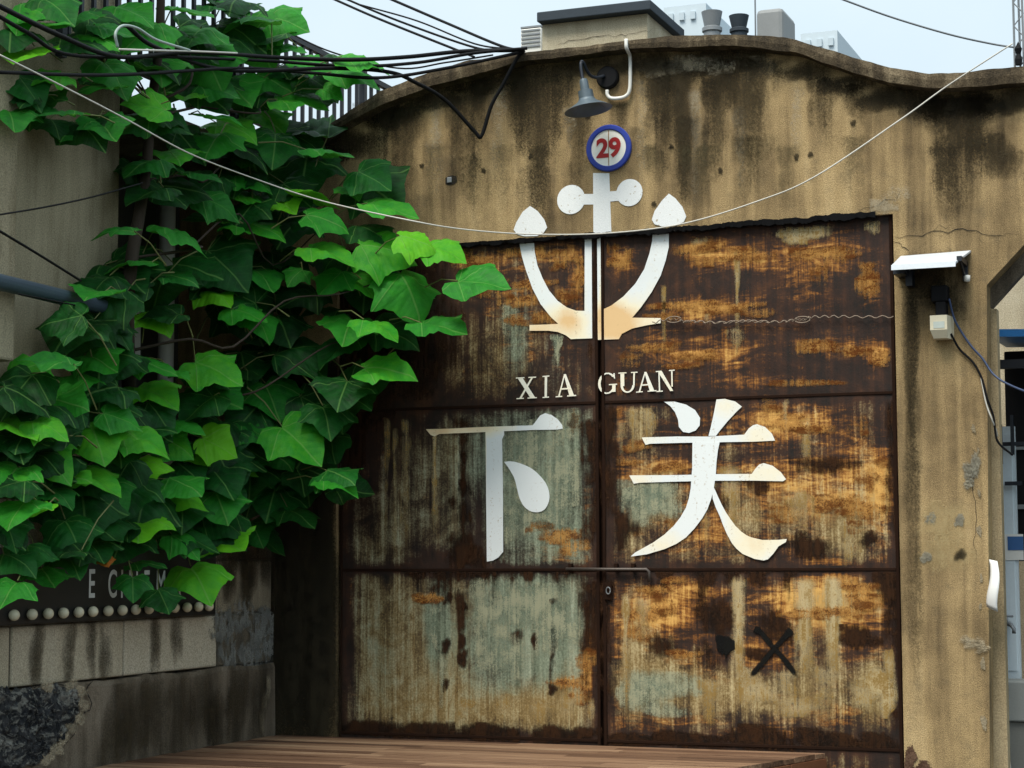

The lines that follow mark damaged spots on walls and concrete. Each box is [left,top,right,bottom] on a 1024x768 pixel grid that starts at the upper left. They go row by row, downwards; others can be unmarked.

damp [325,50,1024,206]
crack [895,226,1018,253]
corrosion [534,244,631,370]
corrosion [406,419,576,667]
corrosion [747,401,899,559]
damp [903,267,964,592]
spalling [962,448,981,497]
damp [30,627,43,685]
damp [88,490,343,766]
corrosion [546,572,769,706]
corrosion [743,572,902,675]
spalling [0,682,82,768]